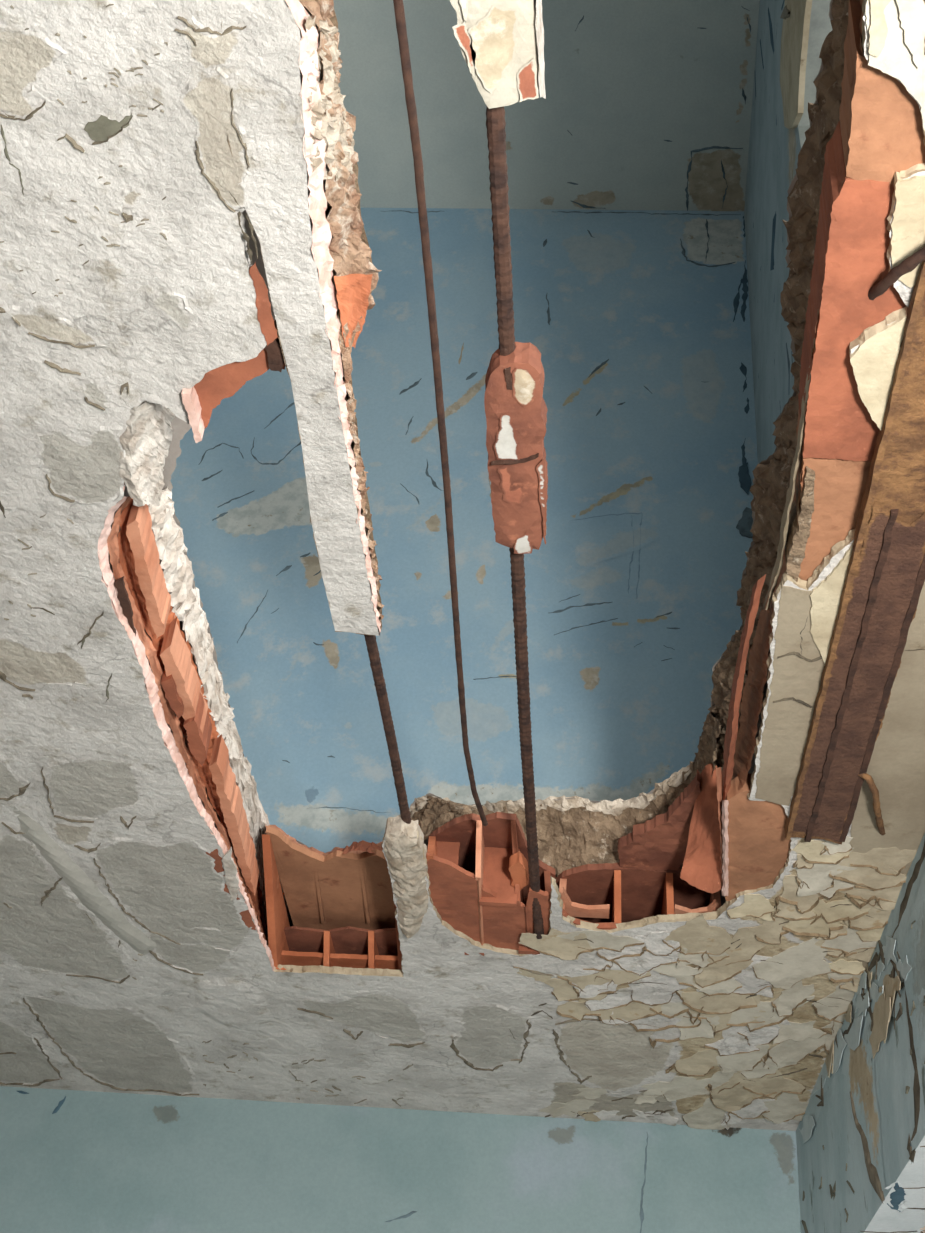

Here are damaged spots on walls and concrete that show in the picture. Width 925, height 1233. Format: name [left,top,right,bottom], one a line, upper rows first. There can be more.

peeling [0,305,106,350]
peeling [144,287,194,333]
spalling [249,262,278,346]
peeling [44,360,129,411]
spalling [409,0,922,877]
spalling [0,426,289,984]
rust [788,504,925,844]
flaking render [509,581,925,1213]
crack [510,1003,553,1039]
peeling [802,1163,855,1222]